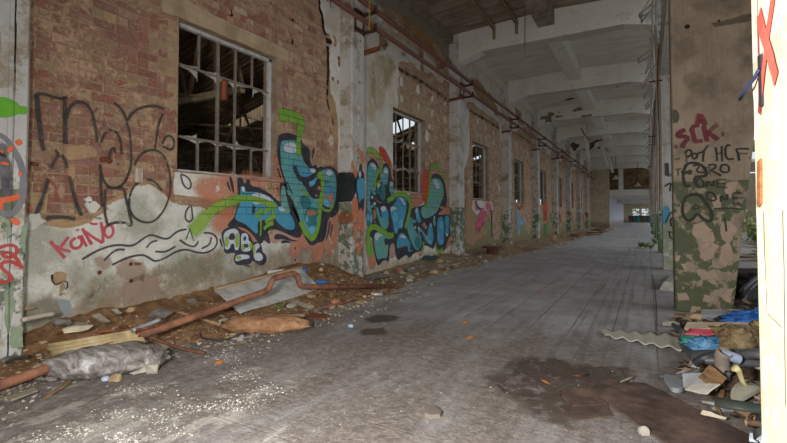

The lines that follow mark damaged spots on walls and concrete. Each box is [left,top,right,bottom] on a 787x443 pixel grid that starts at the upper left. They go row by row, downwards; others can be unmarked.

crack [318,0,334,125]
peeling [752,77,778,174]
peeling [712,181,738,210]
flaking render [51,272,68,296]
flaking render [96,258,167,306]
peeling [677,288,734,313]
peeling [692,221,737,281]
peeling [756,208,766,298]
damp [489,358,629,424]
peeling [760,338,779,392]